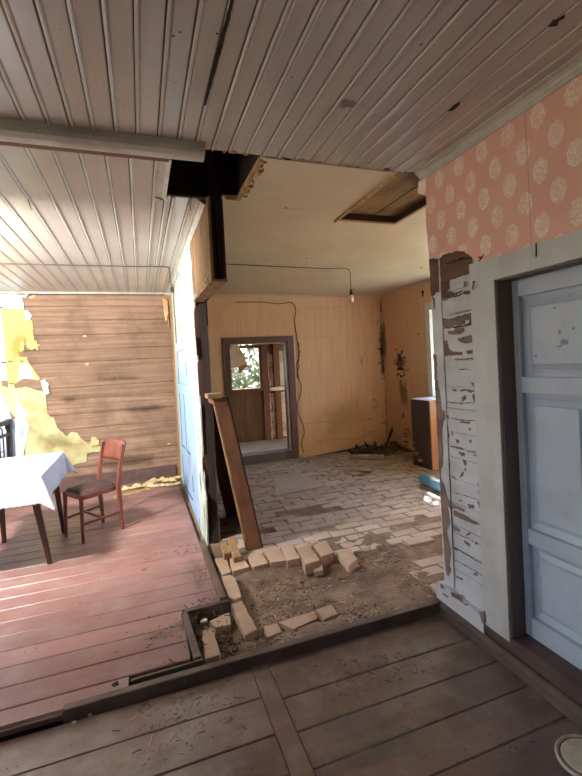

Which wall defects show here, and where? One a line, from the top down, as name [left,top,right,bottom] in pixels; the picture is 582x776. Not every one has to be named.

peeling [420,251,473,309]
peeling [0,292,32,381]
peeling [19,364,50,395]
leakage [377,303,409,403]
peeling [0,392,29,458]
peeling [433,313,480,580]